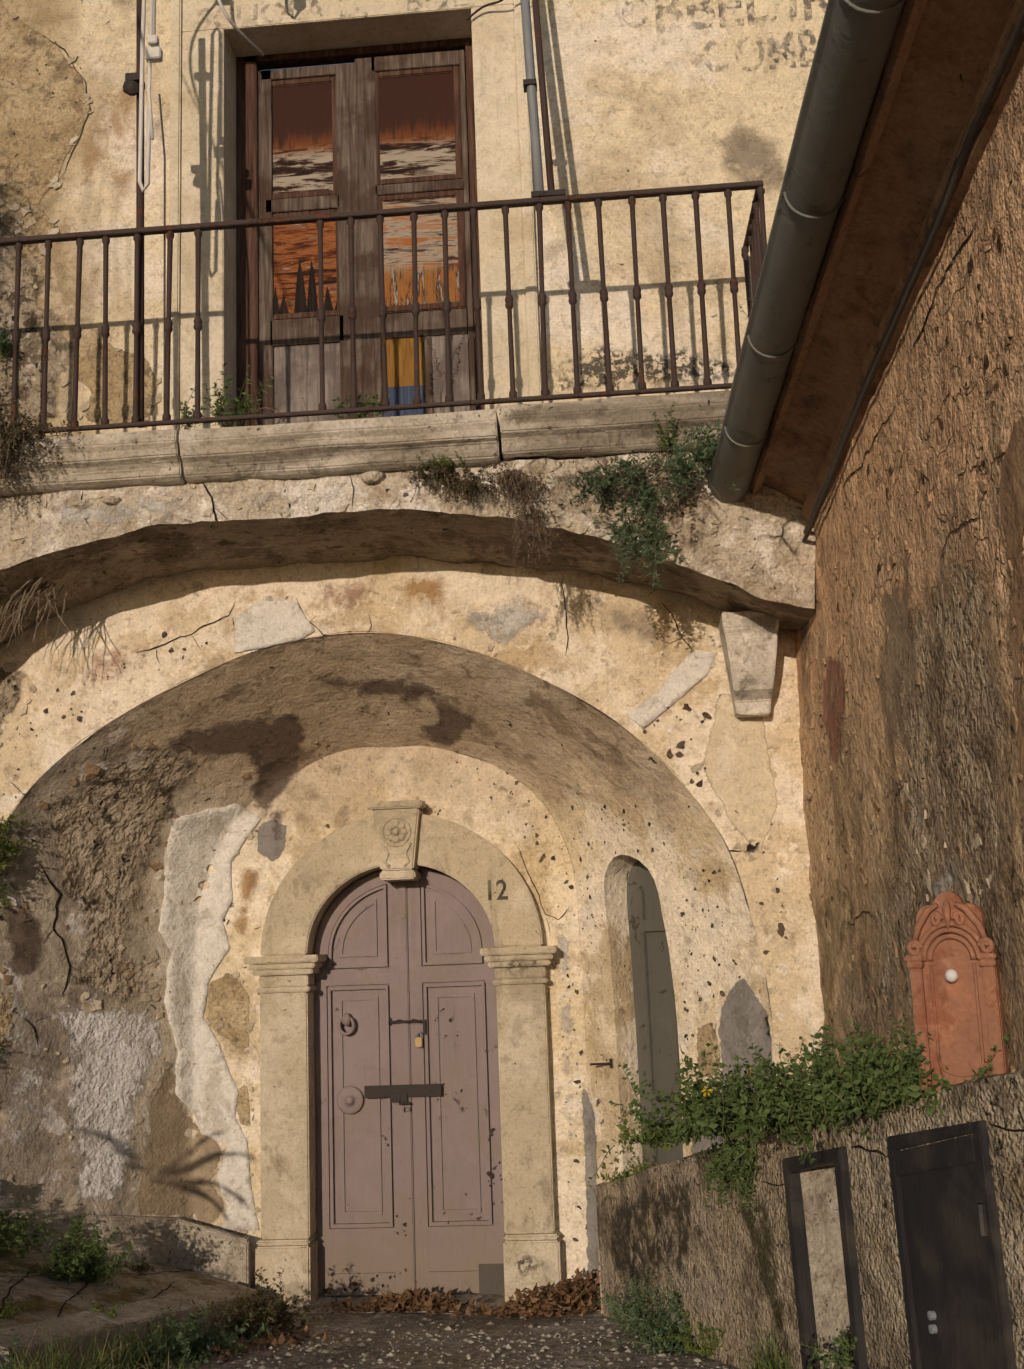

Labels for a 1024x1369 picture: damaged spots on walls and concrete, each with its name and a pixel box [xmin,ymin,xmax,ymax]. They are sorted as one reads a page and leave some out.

peeling [0,0,162,428]
water stain [727,131,782,184]
crack [911,222,976,351]
crack [842,404,896,490]
crack [940,518,982,557]
crack [136,603,235,662]
peeling [0,661,126,747]
crack [10,866,79,1044]
peeling [0,803,262,1237]
water stain [611,1182,699,1296]